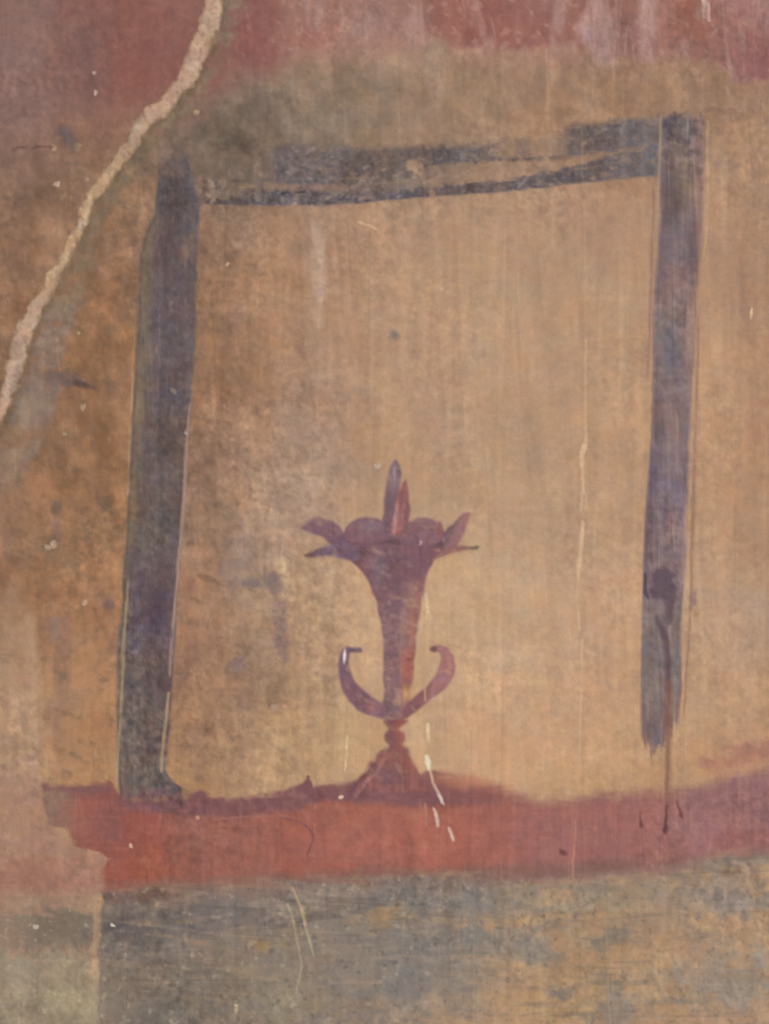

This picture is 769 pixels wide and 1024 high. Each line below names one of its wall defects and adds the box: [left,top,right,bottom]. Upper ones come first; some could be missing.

crack [0,0,251,507]
peeling [423,722,456,843]